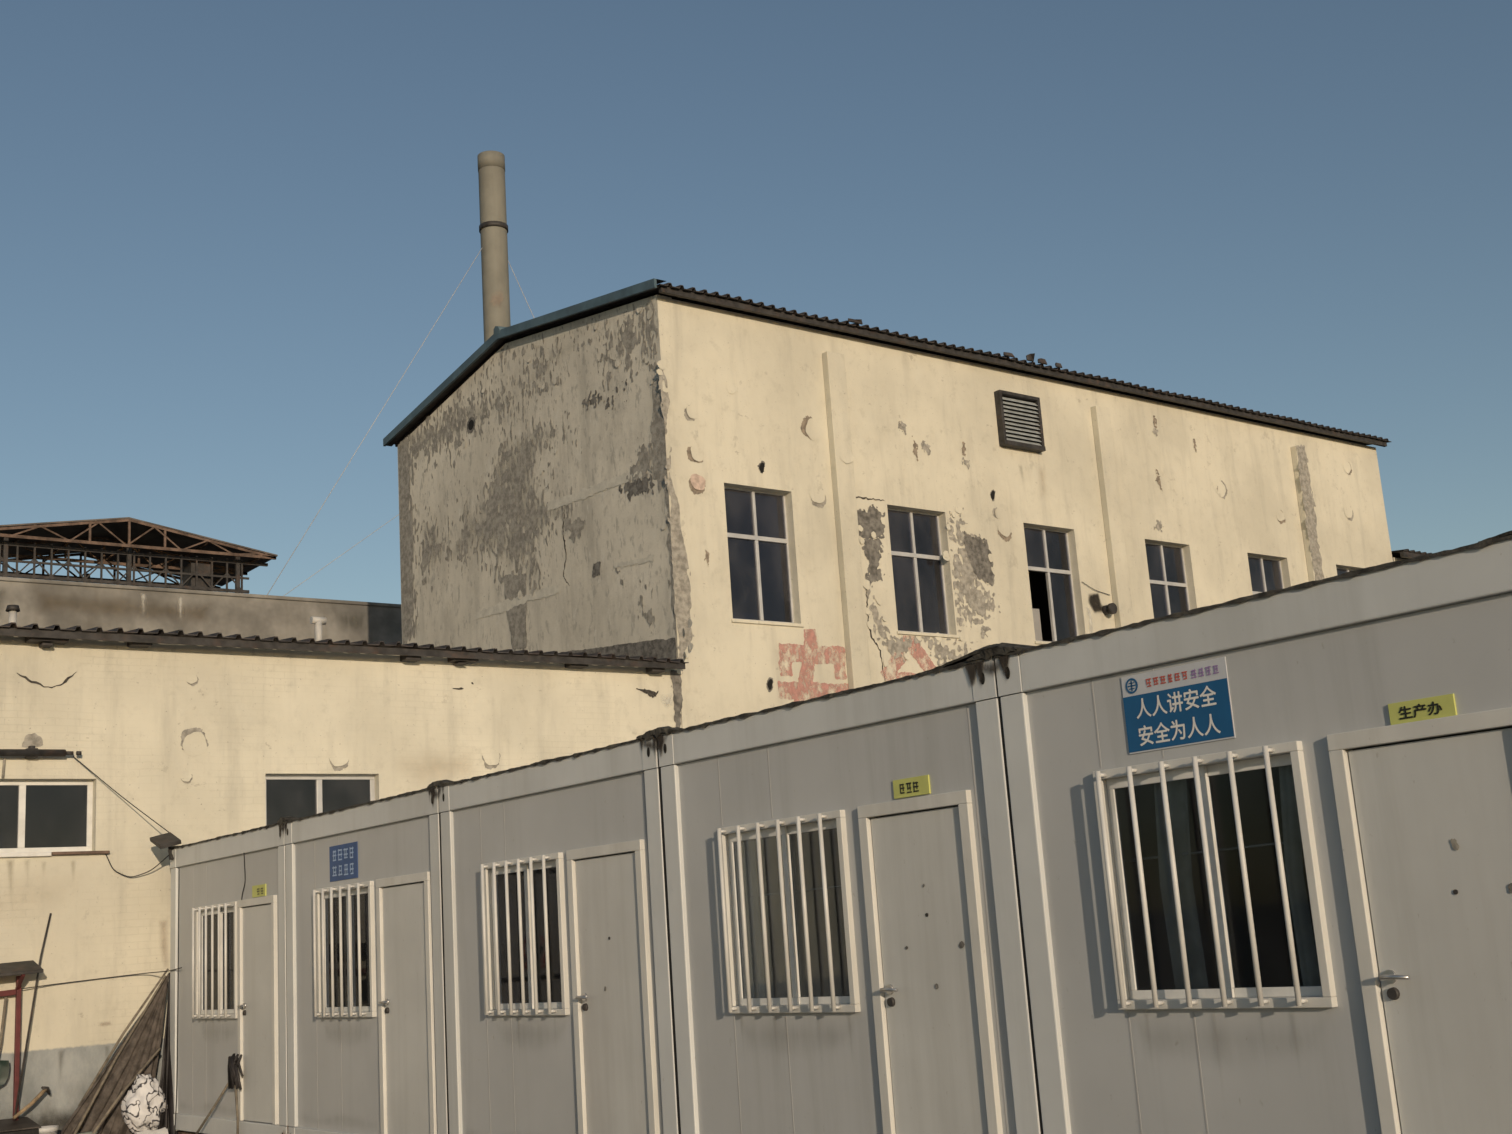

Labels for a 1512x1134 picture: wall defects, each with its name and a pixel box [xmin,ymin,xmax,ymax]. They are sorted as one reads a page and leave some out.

peeling [398,301,709,728]
peeling [857,489,1012,667]
peeling [1296,445,1324,581]
crack [17,672,76,688]